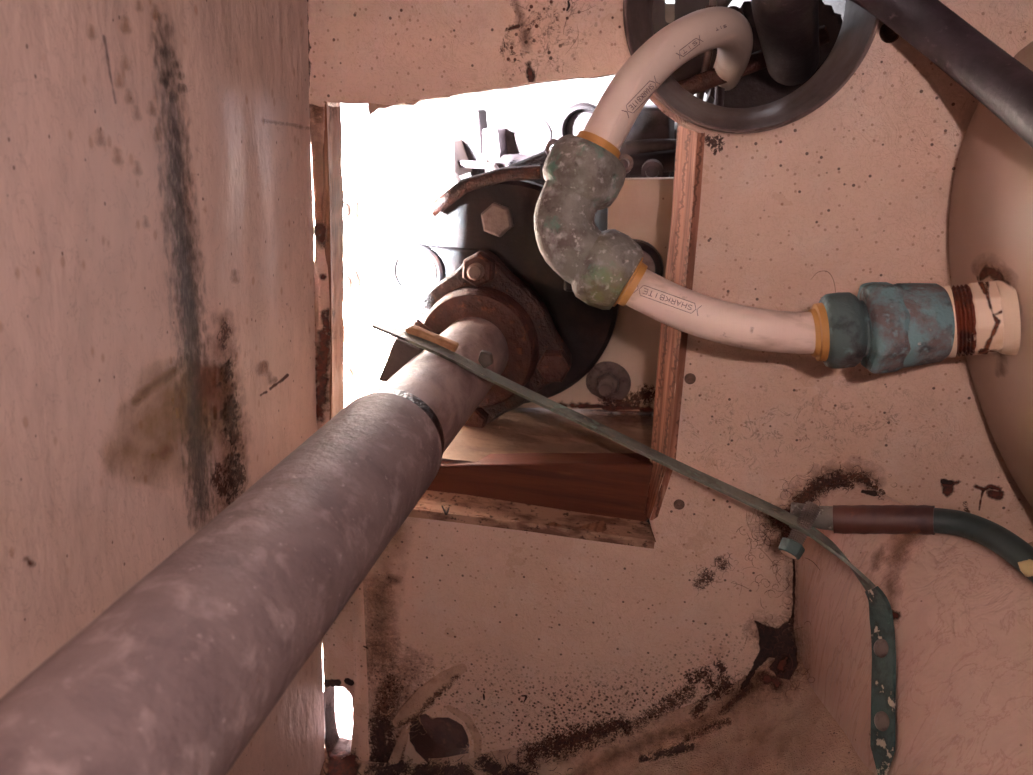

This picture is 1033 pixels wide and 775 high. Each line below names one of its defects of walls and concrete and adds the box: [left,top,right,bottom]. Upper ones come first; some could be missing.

peeling [368,100,420,114]
leakage [324,675,405,775]
leakage [513,647,767,775]